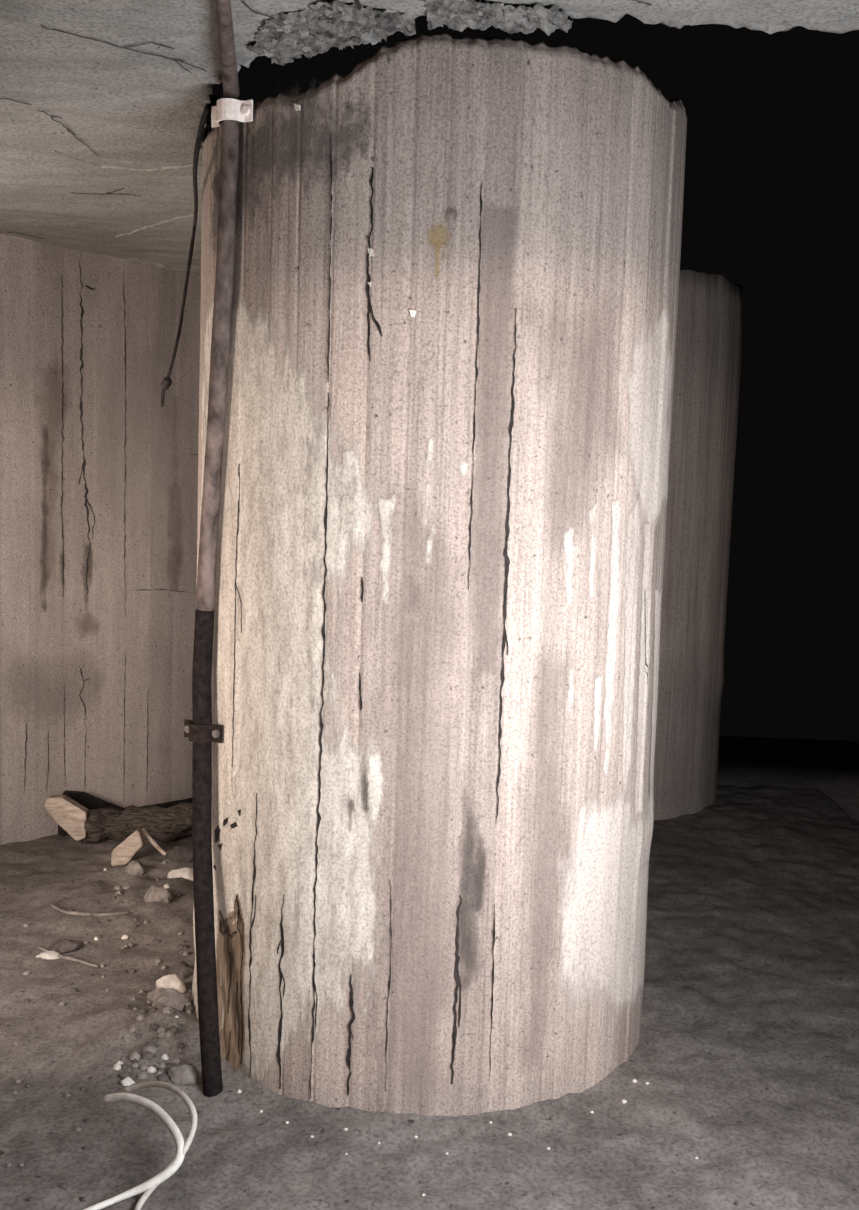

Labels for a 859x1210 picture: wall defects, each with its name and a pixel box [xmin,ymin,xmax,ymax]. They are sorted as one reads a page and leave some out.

crack [0,98,99,156]
crack [41,24,207,73]
spalling [248,0,573,66]
crack [366,167,382,362]
crack [61,264,196,618]
crack [248,150,333,1100]
crack [496,308,517,820]
crack [346,974,355,1096]
crack [384,882,392,1076]
crack [450,895,462,1084]
leakage [460,822,485,966]
crack [488,904,496,1079]